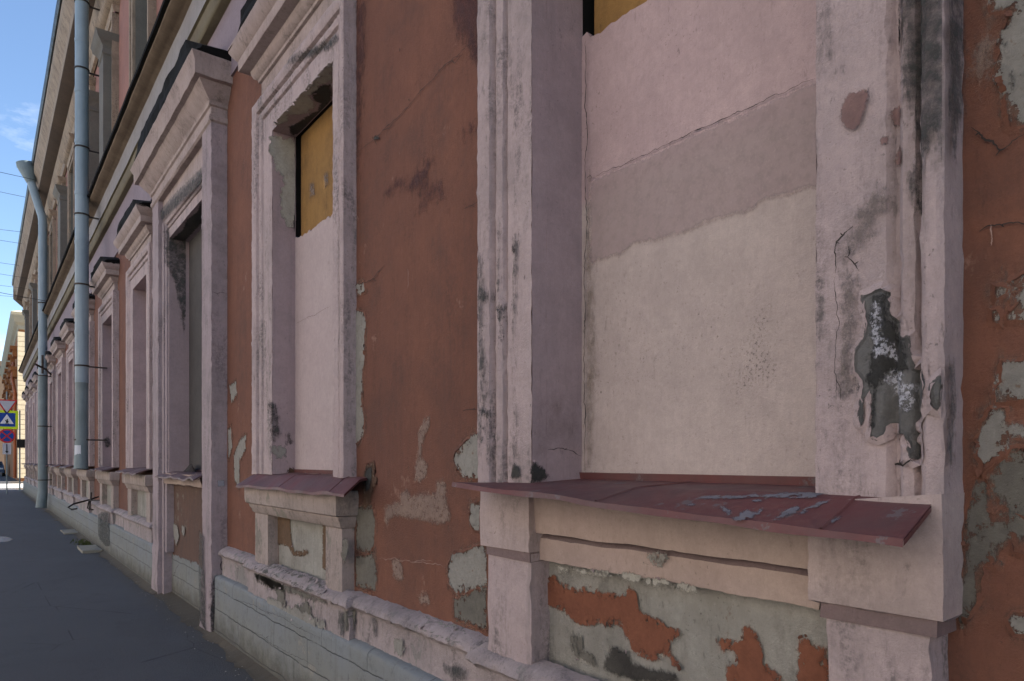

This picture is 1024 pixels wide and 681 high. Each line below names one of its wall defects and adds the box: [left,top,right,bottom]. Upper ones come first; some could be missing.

peeling [268,61,333,228]
peeling [841,90,868,130]
damp [900,0,966,209]
crack [971,127,1024,155]
damp [161,169,202,327]
damp [268,402,292,444]
crack [834,226,859,403]
spalling [848,281,943,469]
peeling [956,353,1024,631]
peeling [415,498,489,646]
peeling [548,552,698,671]
damp [570,635,677,681]